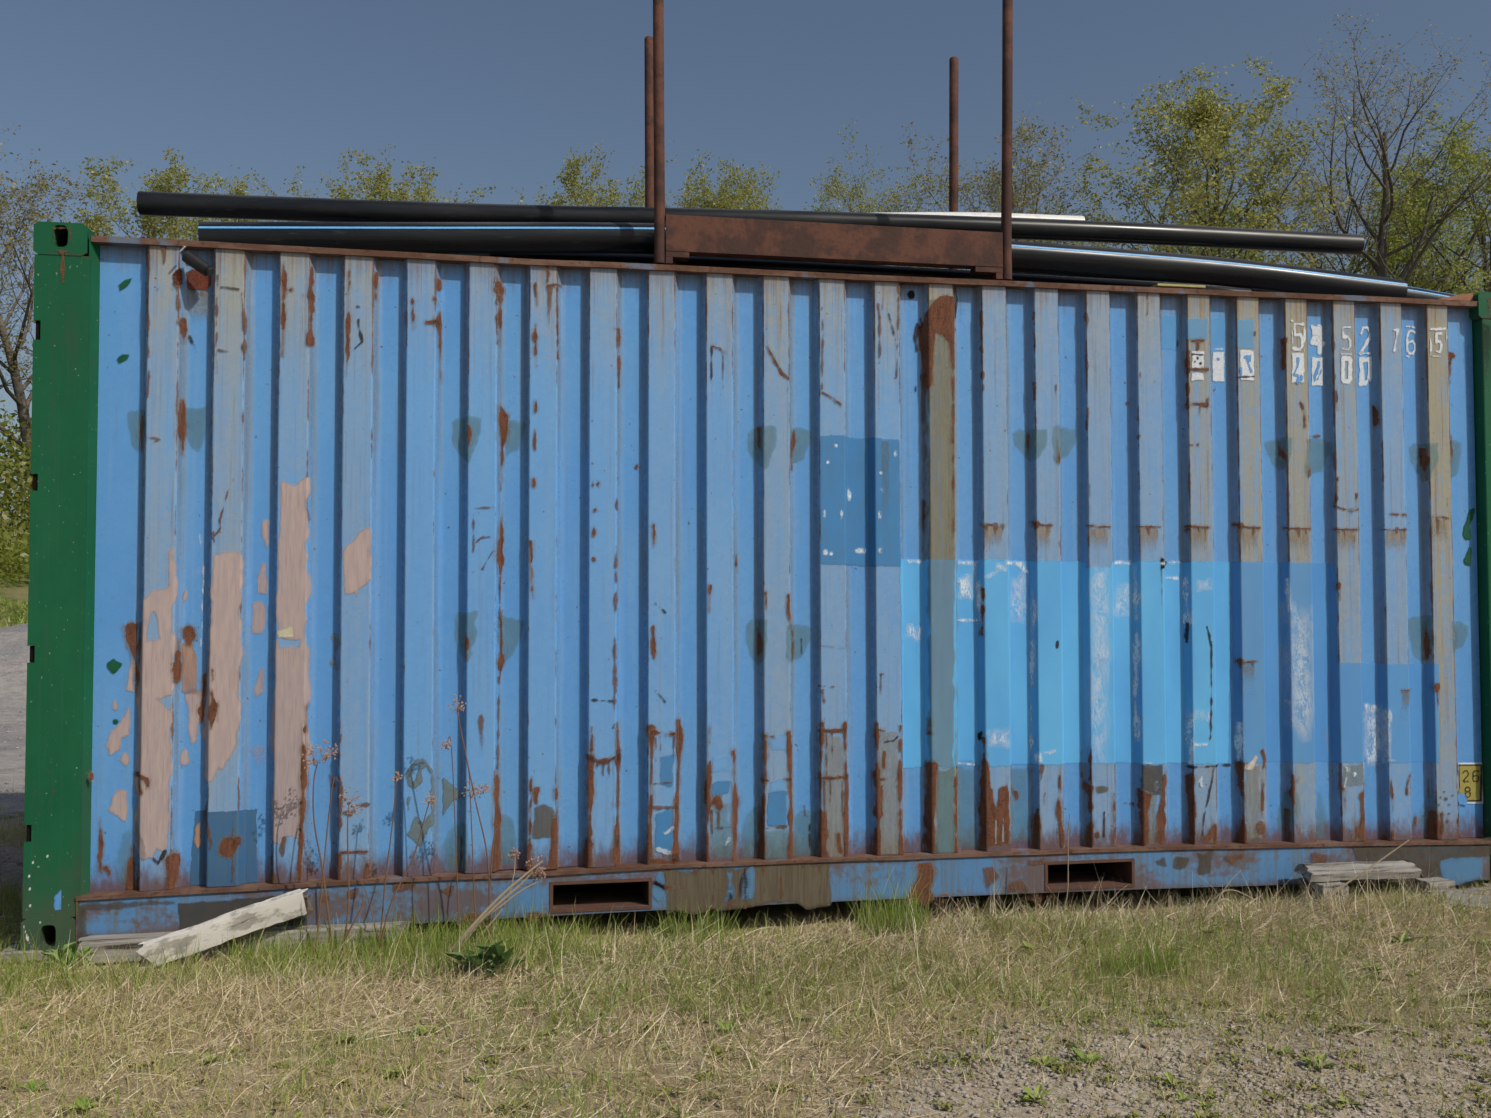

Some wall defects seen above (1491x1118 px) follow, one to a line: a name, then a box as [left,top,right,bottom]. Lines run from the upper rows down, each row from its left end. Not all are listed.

corrosion [919,294,955,495]
peeling [343,528,372,596]
peeling [106,477,312,861]
corrosion [270,705,309,884]
corrosion [478,521,505,872]
corrosion [526,778,559,870]
corrosion [583,639,621,867]
corrosion [647,718,684,864]
corrosion [761,730,806,859]
corrosion [923,761,958,853]
corrosion [978,731,1018,847]
corrosion [1185,769,1218,845]